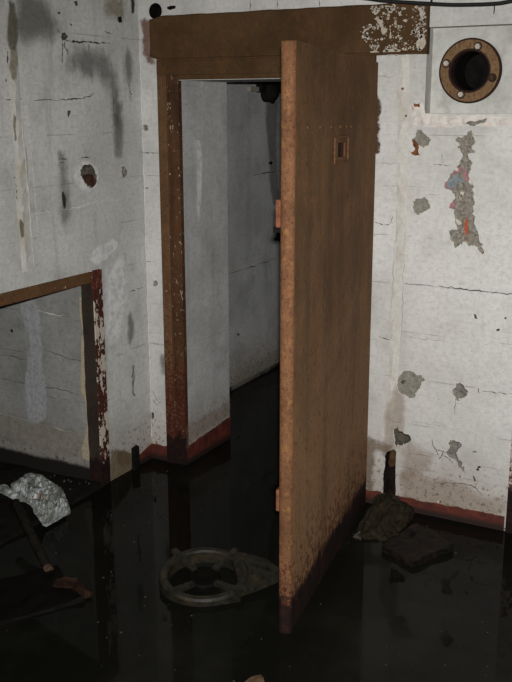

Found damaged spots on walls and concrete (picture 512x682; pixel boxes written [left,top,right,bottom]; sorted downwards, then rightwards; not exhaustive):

peeling [360,4,427,56]
spalling [411,129,431,155]
peeling [444,130,485,254]
spalling [413,197,431,215]
spalling [396,371,425,398]
spalling [452,383,479,409]
spalling [393,426,411,447]
spalling [432,439,465,478]